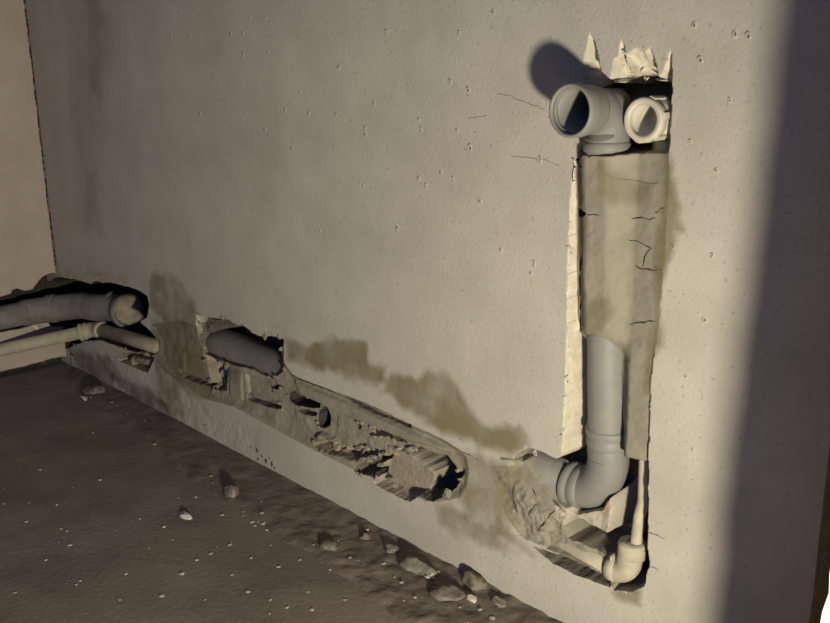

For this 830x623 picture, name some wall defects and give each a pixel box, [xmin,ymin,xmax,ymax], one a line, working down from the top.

flaking render [584,31,672,84]
crack [629,240,658,271]
spalling [0,273,156,338]
spalling [73,338,155,373]
damp [306,343,383,381]
spalling [198,315,465,502]
damp [432,398,519,451]